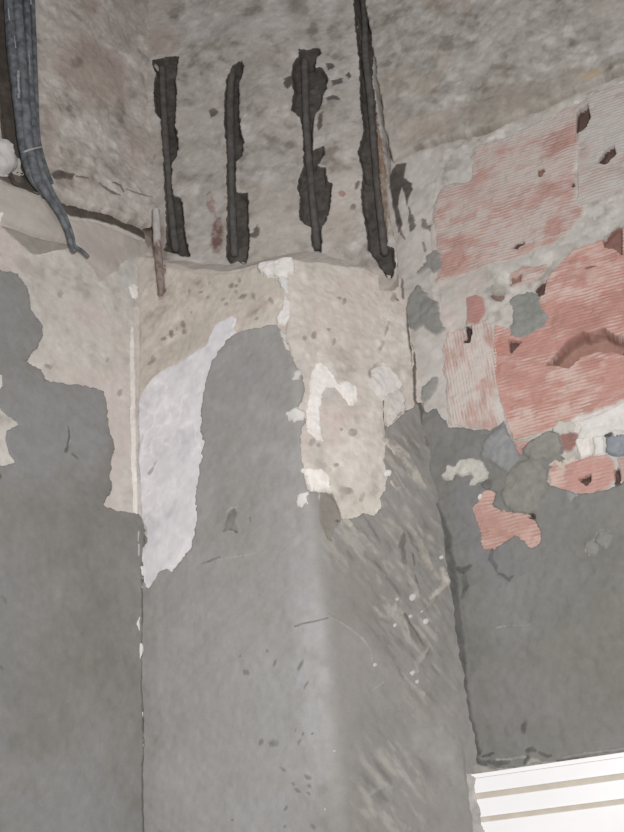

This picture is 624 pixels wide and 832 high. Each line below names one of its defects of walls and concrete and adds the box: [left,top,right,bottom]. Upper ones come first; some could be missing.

rust [142,227,153,242]
peeling [0,0,414,519]
flaking render [428,81,624,502]
flaking render [472,490,541,549]